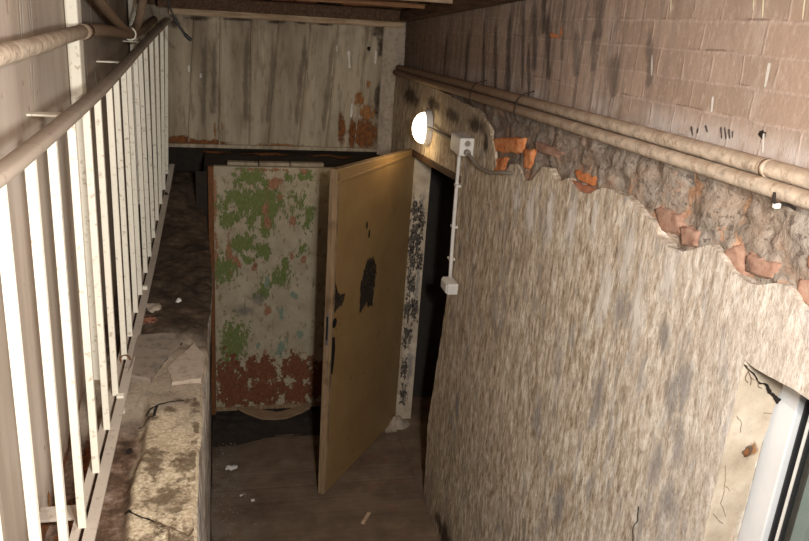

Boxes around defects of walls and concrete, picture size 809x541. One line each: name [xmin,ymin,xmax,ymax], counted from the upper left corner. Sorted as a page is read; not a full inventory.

leakage [521,0,550,96]
rust [168,124,303,156]
rust [310,81,378,159]
peeling [214,167,317,320]
flaking render [435,86,809,306]
crack [139,400,184,429]